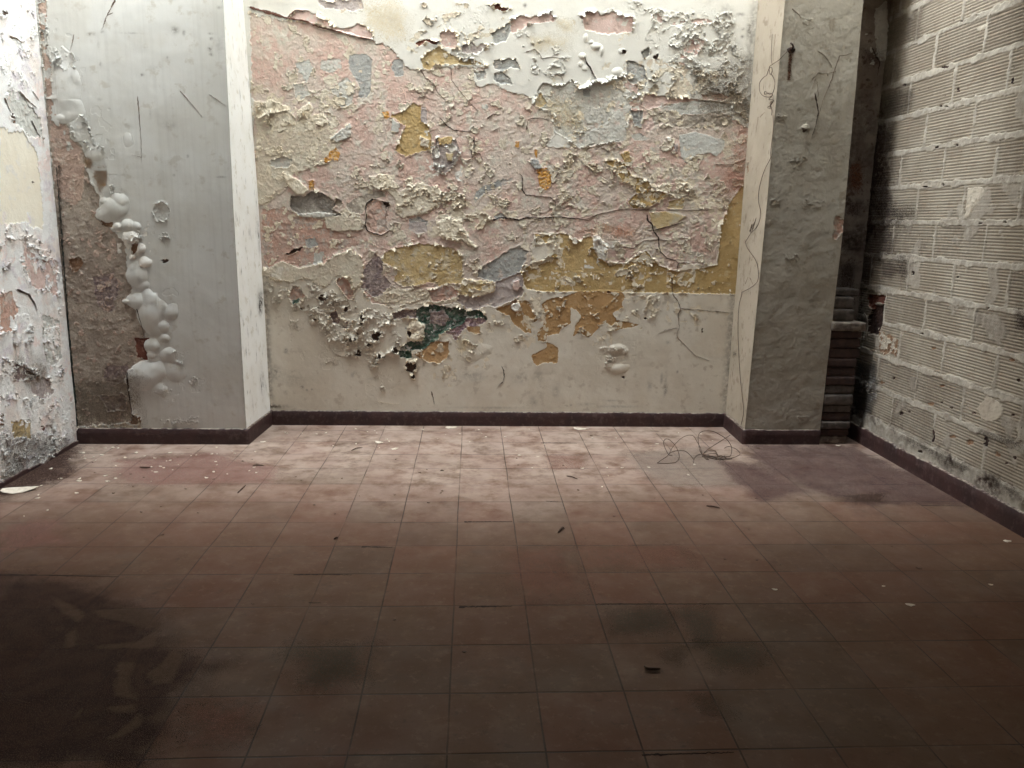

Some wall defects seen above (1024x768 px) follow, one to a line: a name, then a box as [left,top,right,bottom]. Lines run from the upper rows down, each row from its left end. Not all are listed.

peeling [0,0,176,482]
peeling [247,0,754,387]
crack [493,173,730,359]
water stain [852,356,880,422]
water stain [836,3,924,292]